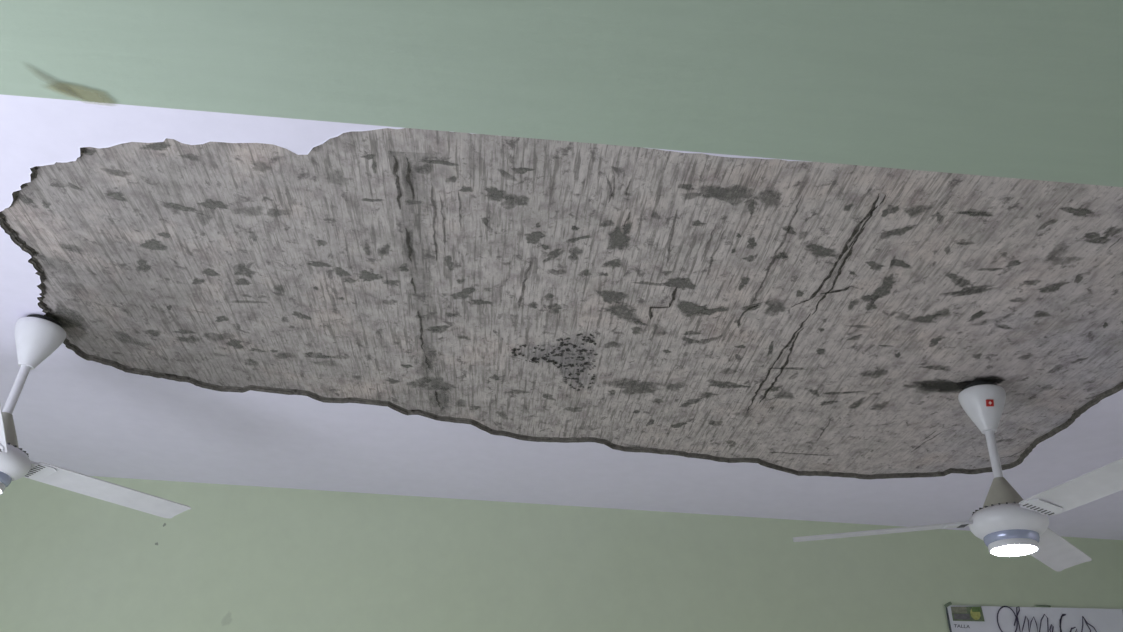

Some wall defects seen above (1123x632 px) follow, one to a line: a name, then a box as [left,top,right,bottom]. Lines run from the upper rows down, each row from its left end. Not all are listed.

water stain [55,86,109,104]
crack [393,156,440,407]
spalling [0,127,1123,479]
crack [738,206,797,328]
crack [747,193,887,411]